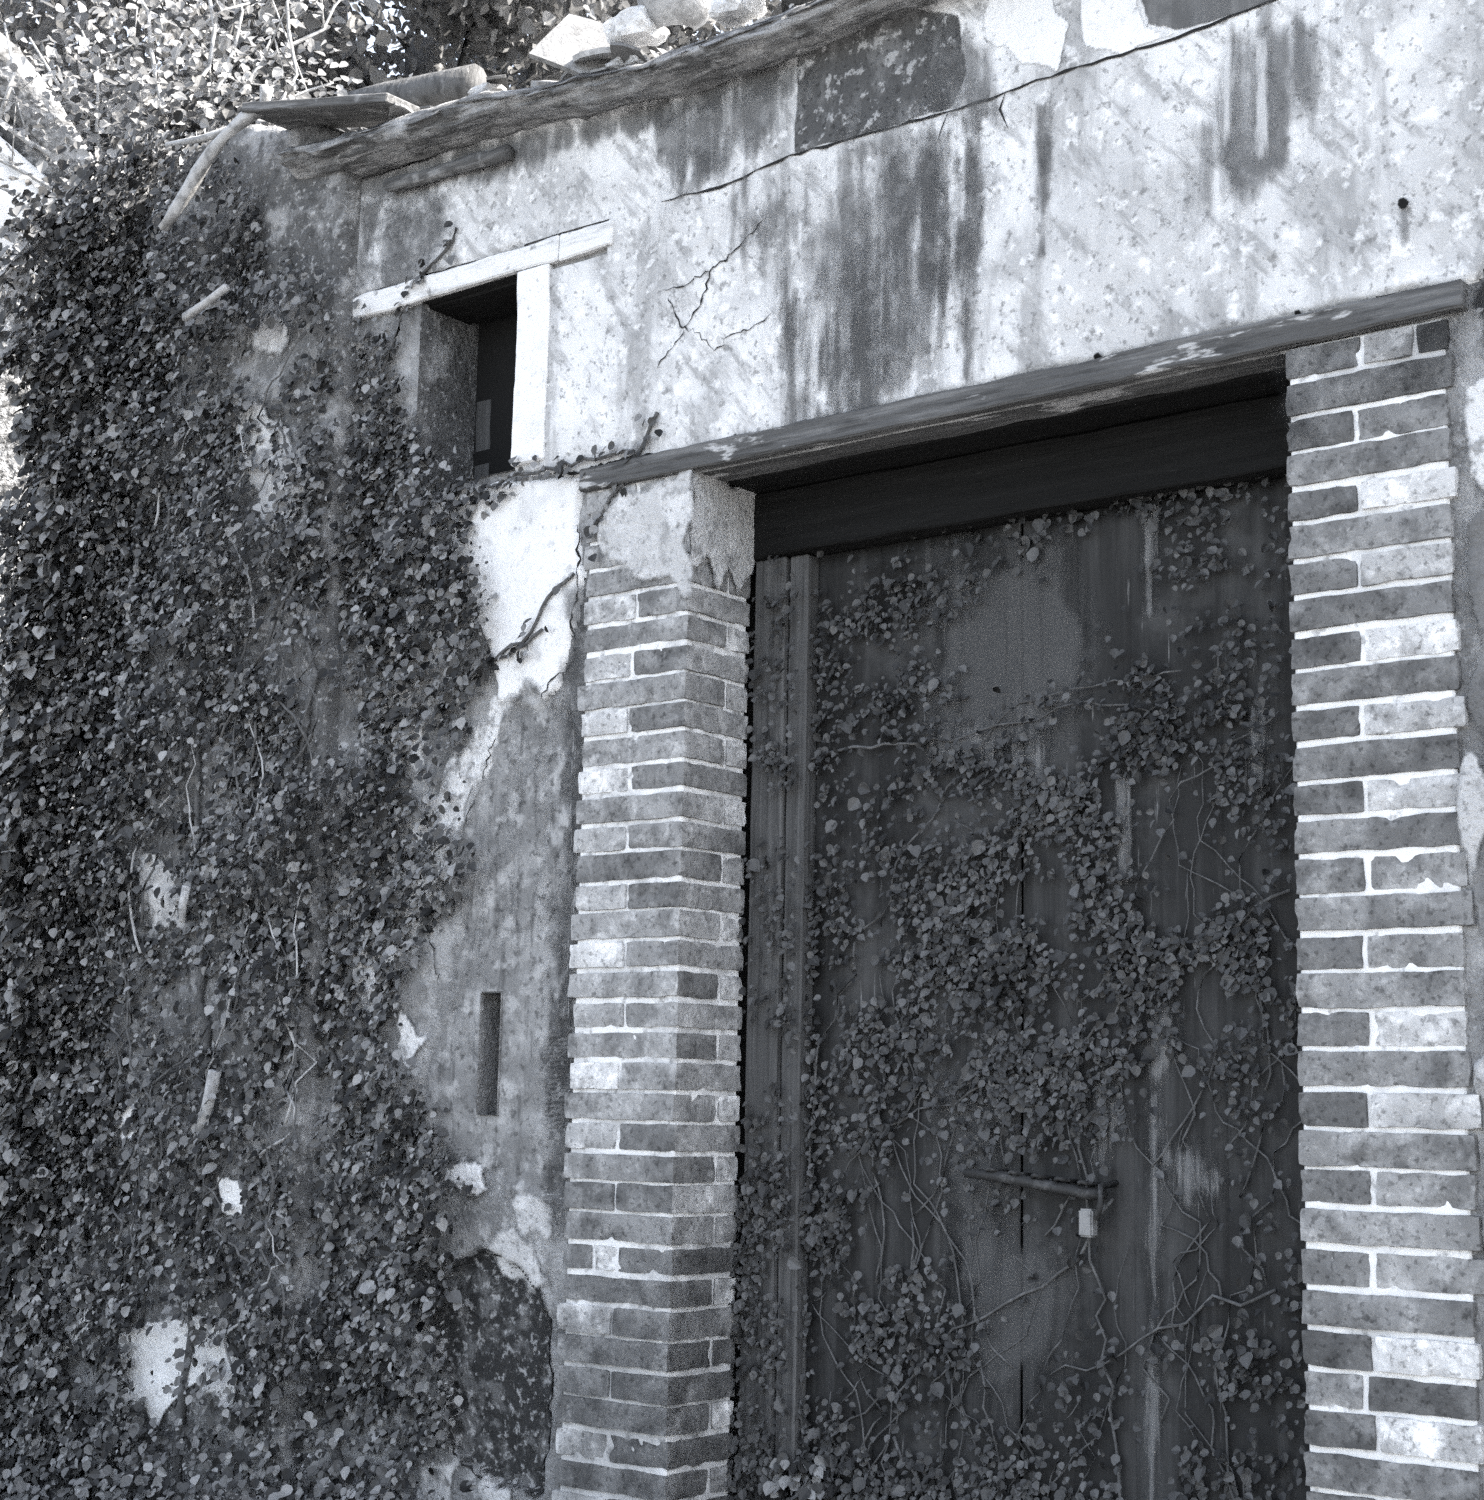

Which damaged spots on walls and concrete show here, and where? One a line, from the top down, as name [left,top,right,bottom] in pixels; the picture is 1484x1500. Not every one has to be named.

damp [784,282,806,422]
damp [812,45,989,411]
crack [661,0,1276,202]
damp [1037,111,1050,210]
damp [1203,19,1315,201]
damp [1473,282,1484,341]
peeling [597,469,756,597]
spalling [353,679,583,1500]